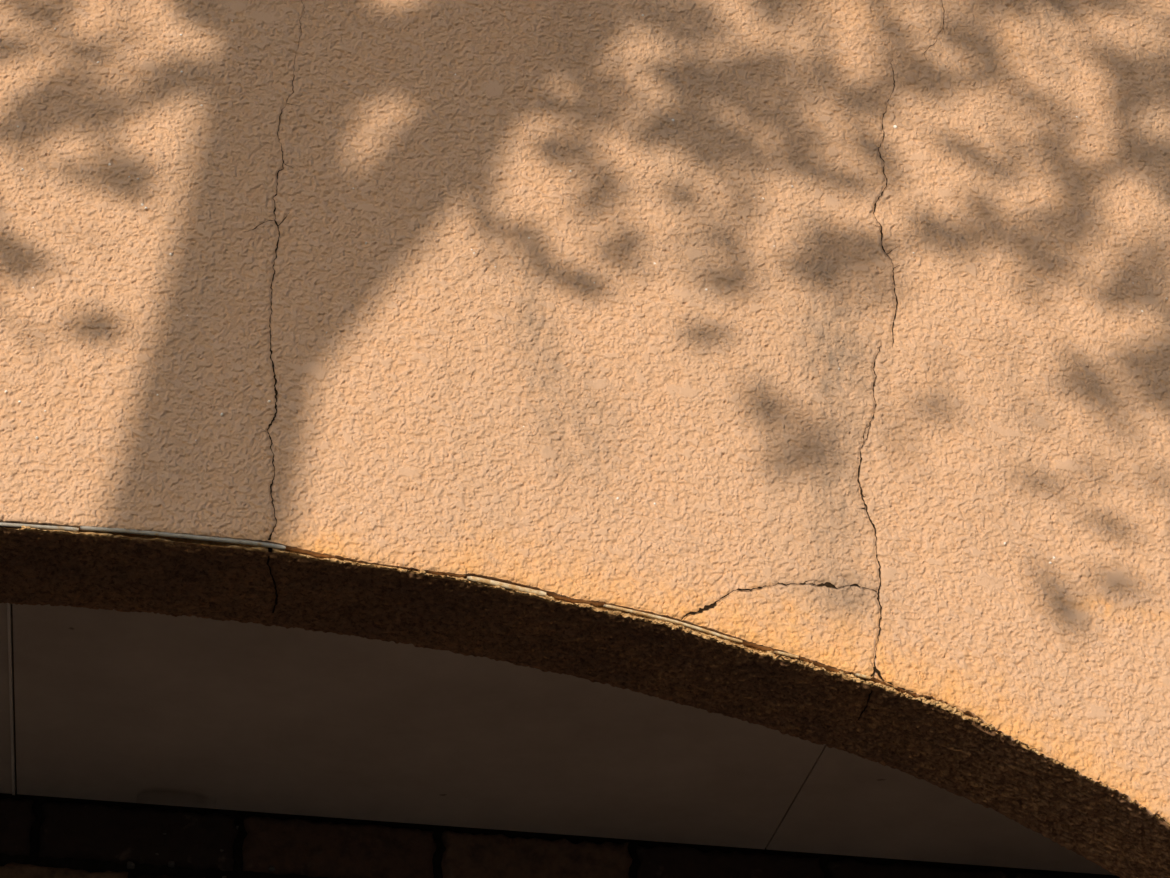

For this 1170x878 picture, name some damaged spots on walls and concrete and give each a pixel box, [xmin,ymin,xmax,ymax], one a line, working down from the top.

crack [246,0,305,613]
crack [681,63,913,721]